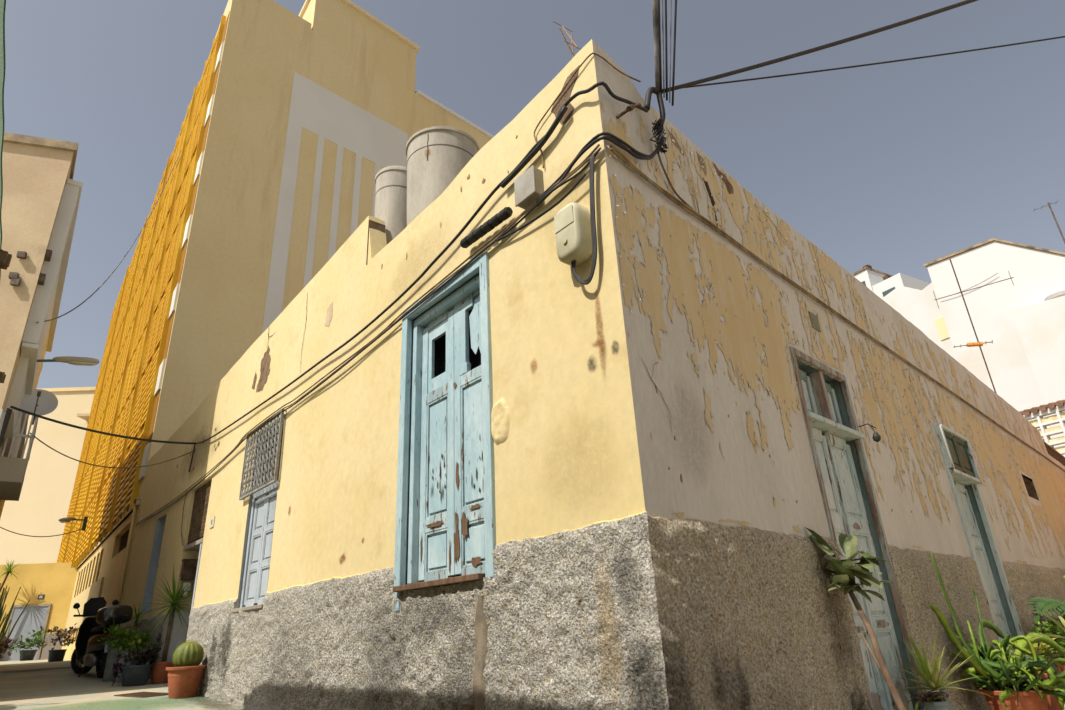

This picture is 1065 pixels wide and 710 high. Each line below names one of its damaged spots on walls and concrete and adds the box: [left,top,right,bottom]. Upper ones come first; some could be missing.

flaking render [551,66,579,125]
peeling [601,101,1065,563]
flaking render [252,346,271,393]
peeling [420,504,481,575]
leakage [633,650,663,710]